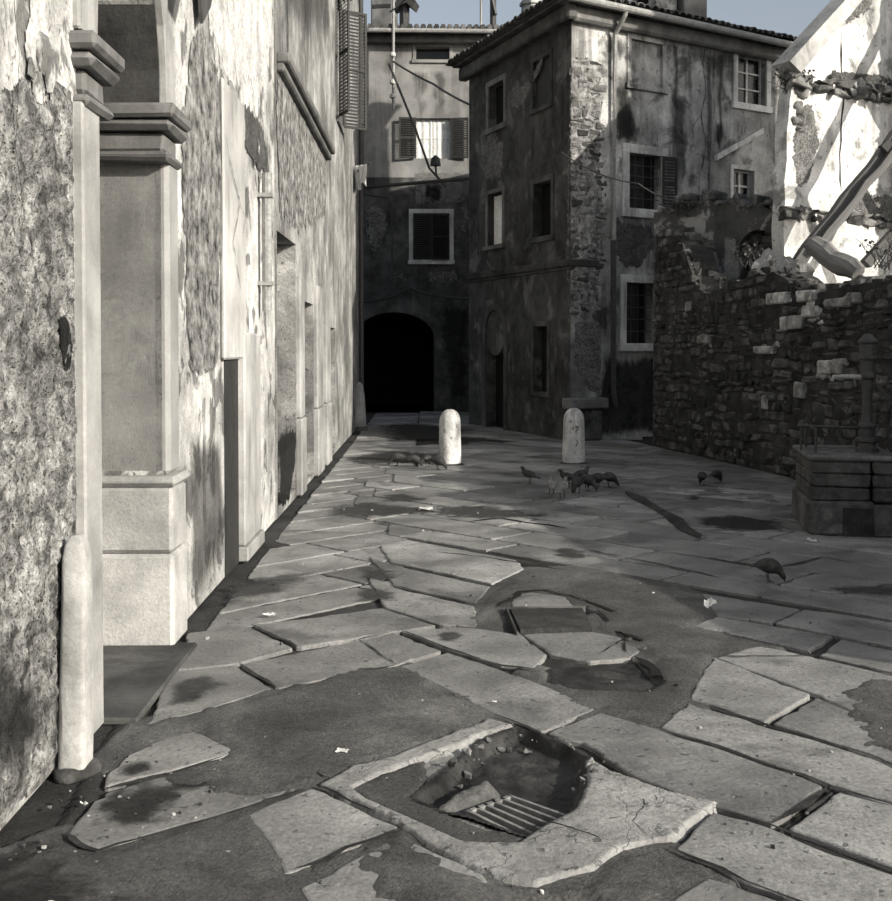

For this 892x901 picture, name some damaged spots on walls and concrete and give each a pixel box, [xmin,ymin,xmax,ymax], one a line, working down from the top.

flaking render [792,104,821,187]
flaking render [566,57,654,328]
crack [518,821,608,840]